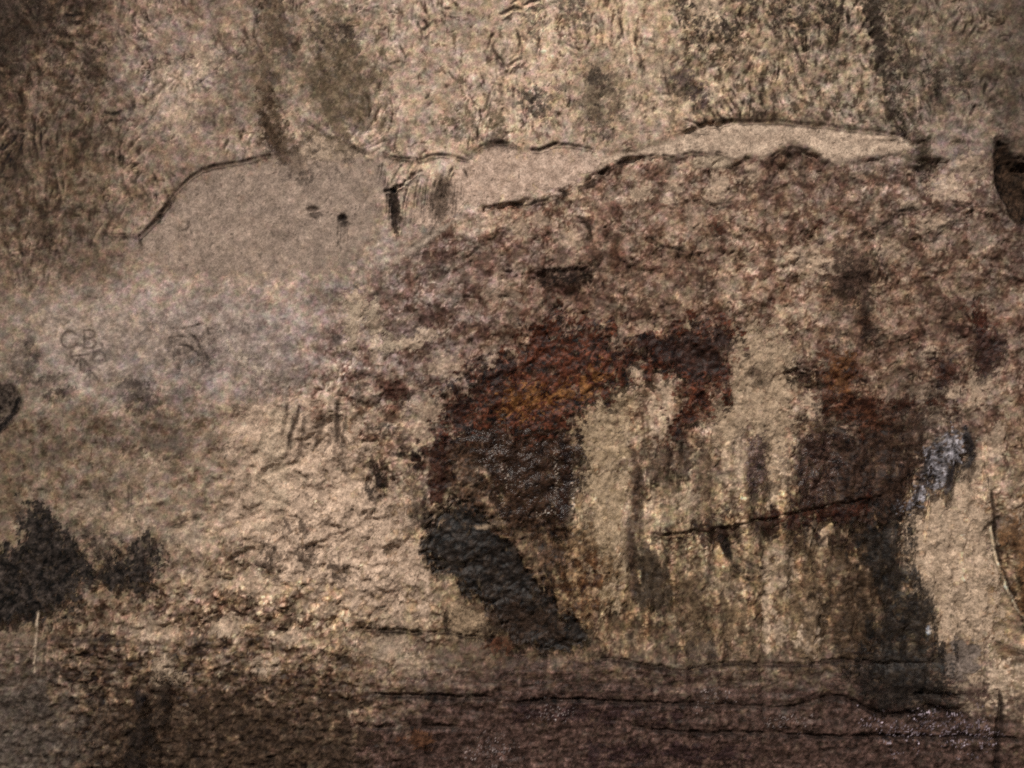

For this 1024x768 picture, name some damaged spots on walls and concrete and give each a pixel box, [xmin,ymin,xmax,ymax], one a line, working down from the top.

crack [101,153,271,244]
crack [303,118,727,257]
crack [695,118,898,164]
damp [80,424,1024,768]
corrosion [369,296,760,629]
crack [650,528,695,536]
corrosion [660,297,1010,551]